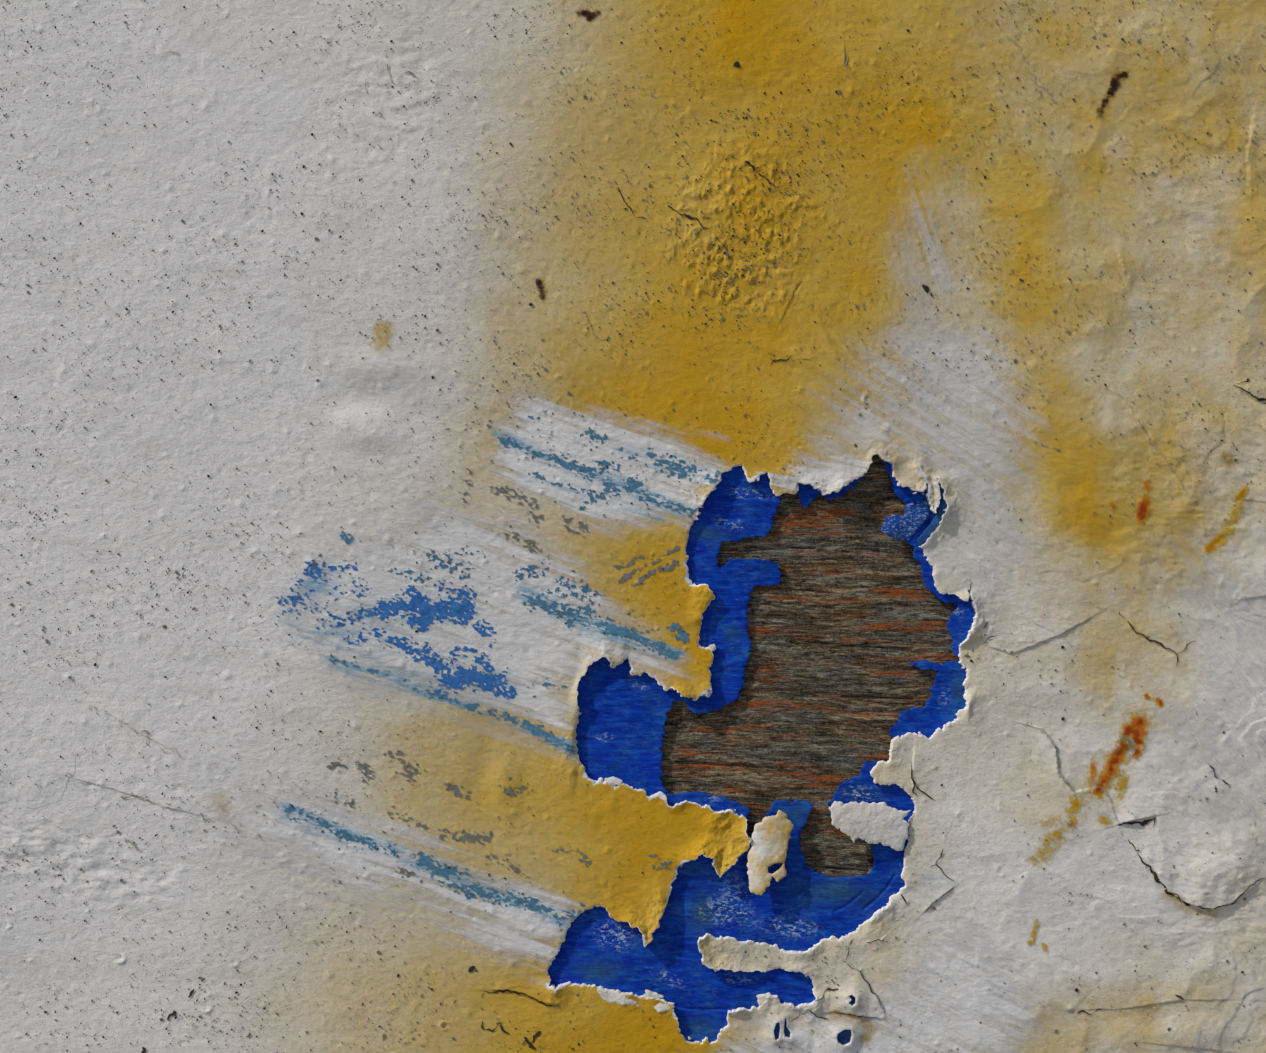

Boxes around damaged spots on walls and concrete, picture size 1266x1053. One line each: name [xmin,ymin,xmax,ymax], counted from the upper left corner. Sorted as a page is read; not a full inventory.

corrosion [1135,481,1151,530]
corrosion [1204,486,1248,554]
crack [1021,601,1195,667]
peeling [548,454,975,1044]
corrosion [1031,714,1150,865]
crack [1012,720,1264,909]